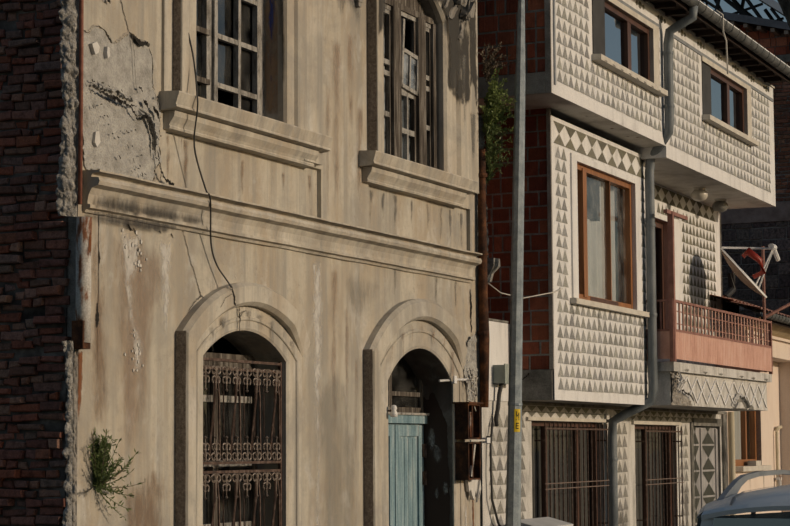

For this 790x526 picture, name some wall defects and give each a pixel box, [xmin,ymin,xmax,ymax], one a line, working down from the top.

flaking render [83,24,162,181]